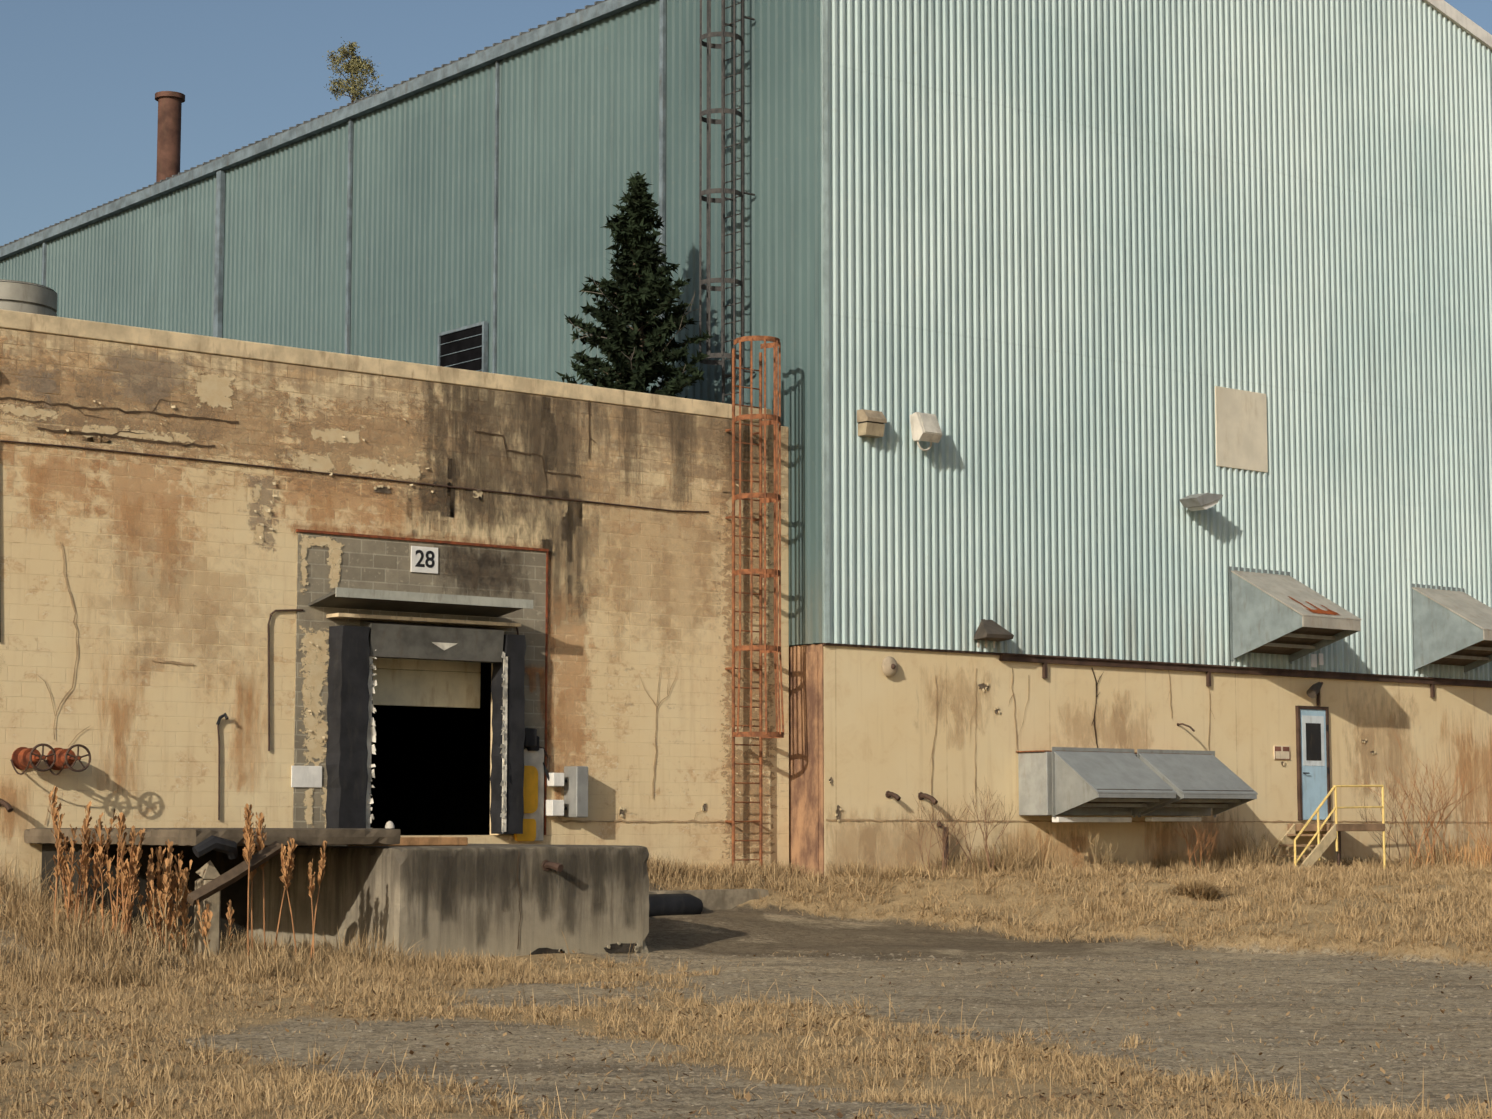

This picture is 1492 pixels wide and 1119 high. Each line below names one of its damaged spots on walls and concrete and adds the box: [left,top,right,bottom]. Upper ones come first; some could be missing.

crack [0,397,239,448]
leakage [429,386,536,520]
peeling [299,533,344,594]
crack [40,542,90,747]
peeling [298,625,329,766]
peeling [303,785,327,828]
crack [552,659,770,824]
crack [510,851,521,949]